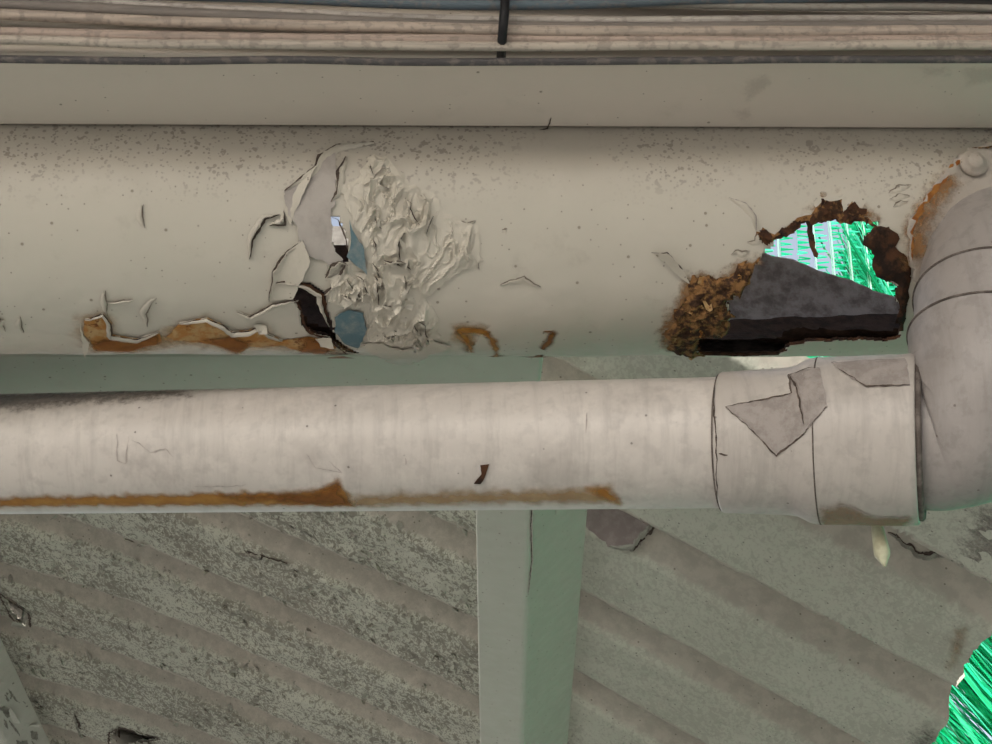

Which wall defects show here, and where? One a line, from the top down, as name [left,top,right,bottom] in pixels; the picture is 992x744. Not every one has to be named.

rust [757,195,880,246]
rust [905,160,960,260]
peeling [327,154,483,365]
rust [659,256,761,359]
rust [80,313,350,359]
rust [455,327,499,357]
peeling [831,358,910,388]
peeling [725,367,827,457]
rust [0,483,619,507]
peeling [586,509,655,551]
crack [888,532,944,561]
peeling [0,682,39,744]